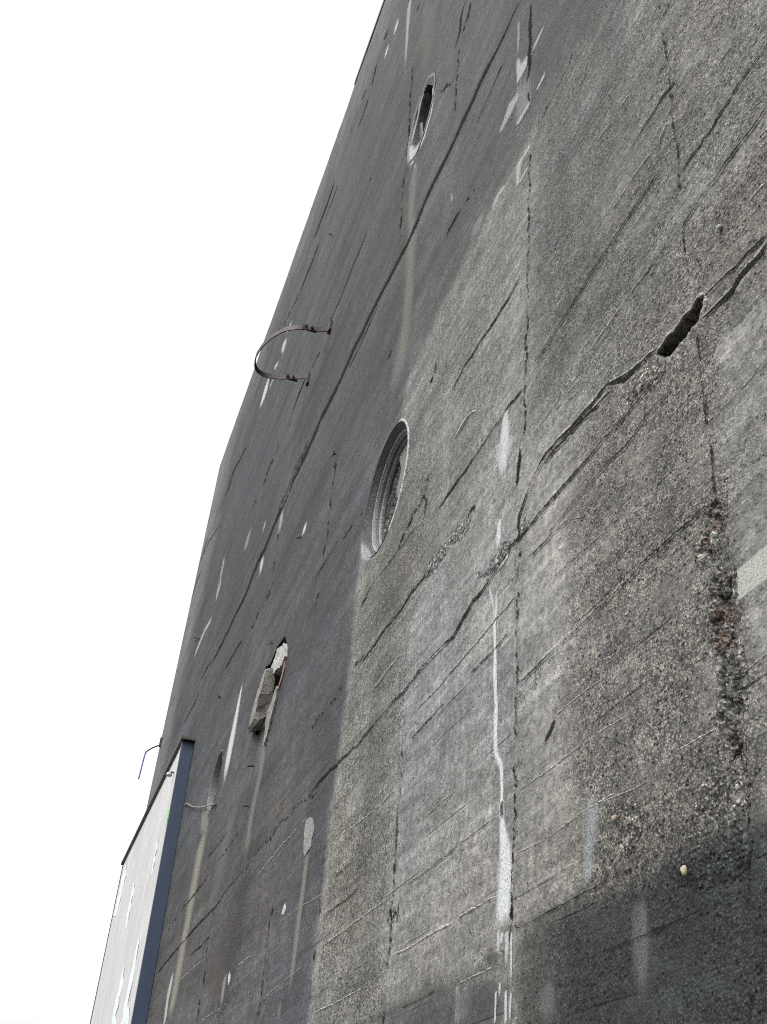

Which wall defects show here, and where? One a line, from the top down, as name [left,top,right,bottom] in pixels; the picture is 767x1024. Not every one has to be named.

spalling [263,643,288,747]
crack [157,0,767,1017]
leakage [489,589,513,974]
spalling [669,494,767,892]